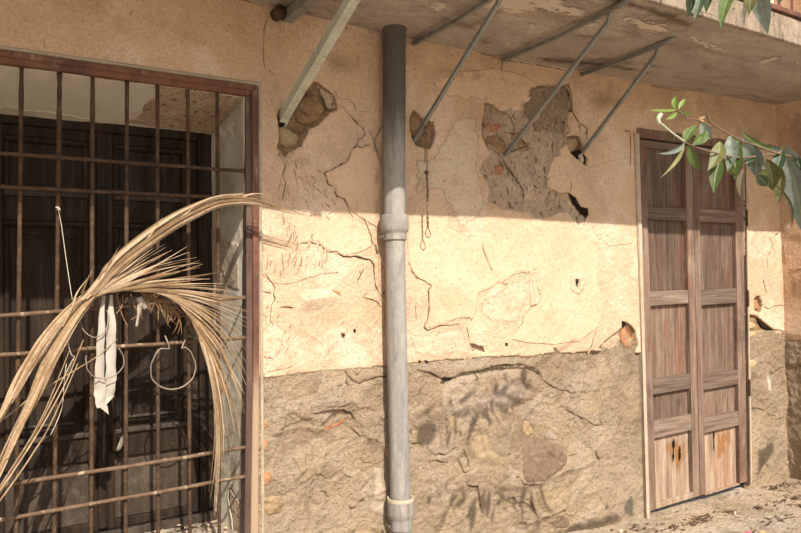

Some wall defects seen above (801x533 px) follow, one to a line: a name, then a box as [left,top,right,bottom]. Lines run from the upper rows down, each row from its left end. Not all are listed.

crack [280,160,288,200]
peeling [262,81,383,284]
crack [299,103,386,307]
peeling [408,68,632,356]
crack [263,271,280,326]
crack [409,262,473,342]
crack [482,245,542,335]
spalling [599,321,638,353]
spalling [741,296,781,338]
crack [417,362,603,426]
flaking render [523,421,567,483]